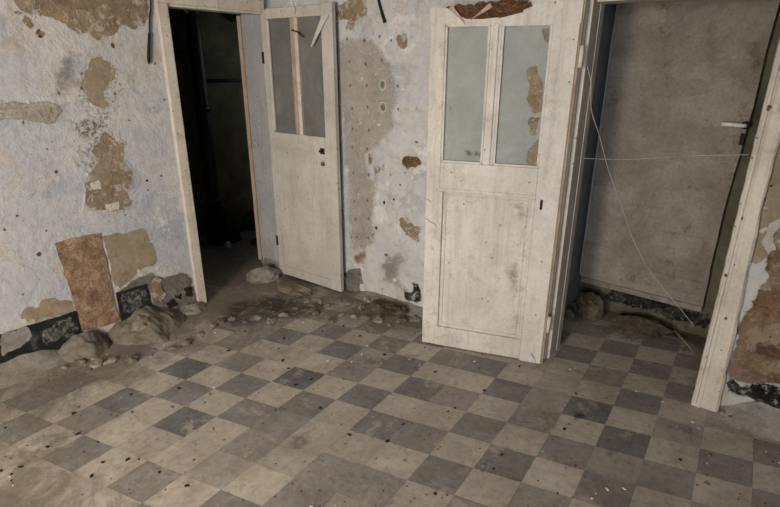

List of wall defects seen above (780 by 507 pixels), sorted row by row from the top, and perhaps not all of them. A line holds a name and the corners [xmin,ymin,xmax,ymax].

peeling [11,0,150,48]
peeling [80,55,118,108]
peeling [82,130,135,214]
flaking render [726,225,780,387]